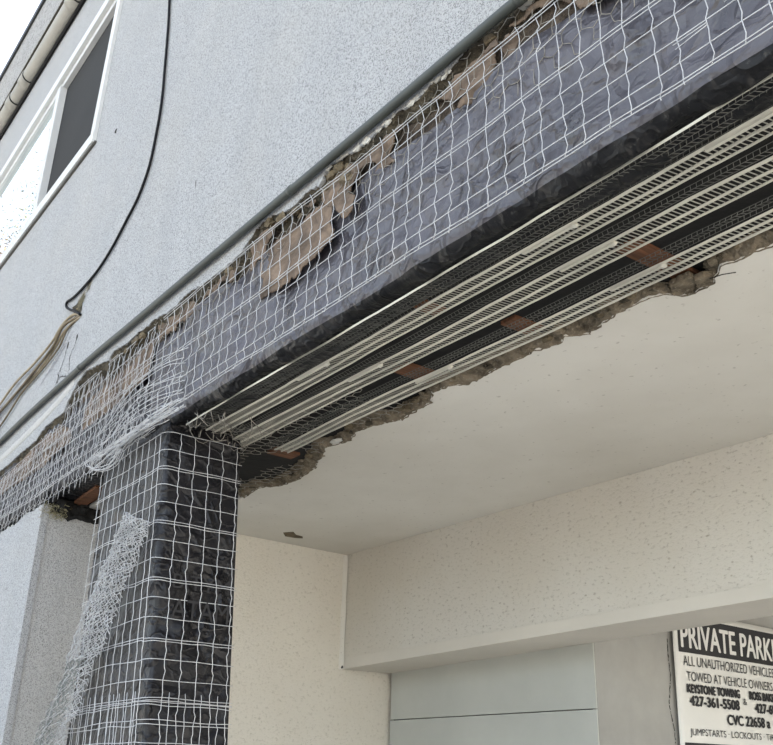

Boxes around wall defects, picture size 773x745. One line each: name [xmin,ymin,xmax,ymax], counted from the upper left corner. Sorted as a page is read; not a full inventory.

spalling [0,0,540,478]
spalling [238,228,773,498]